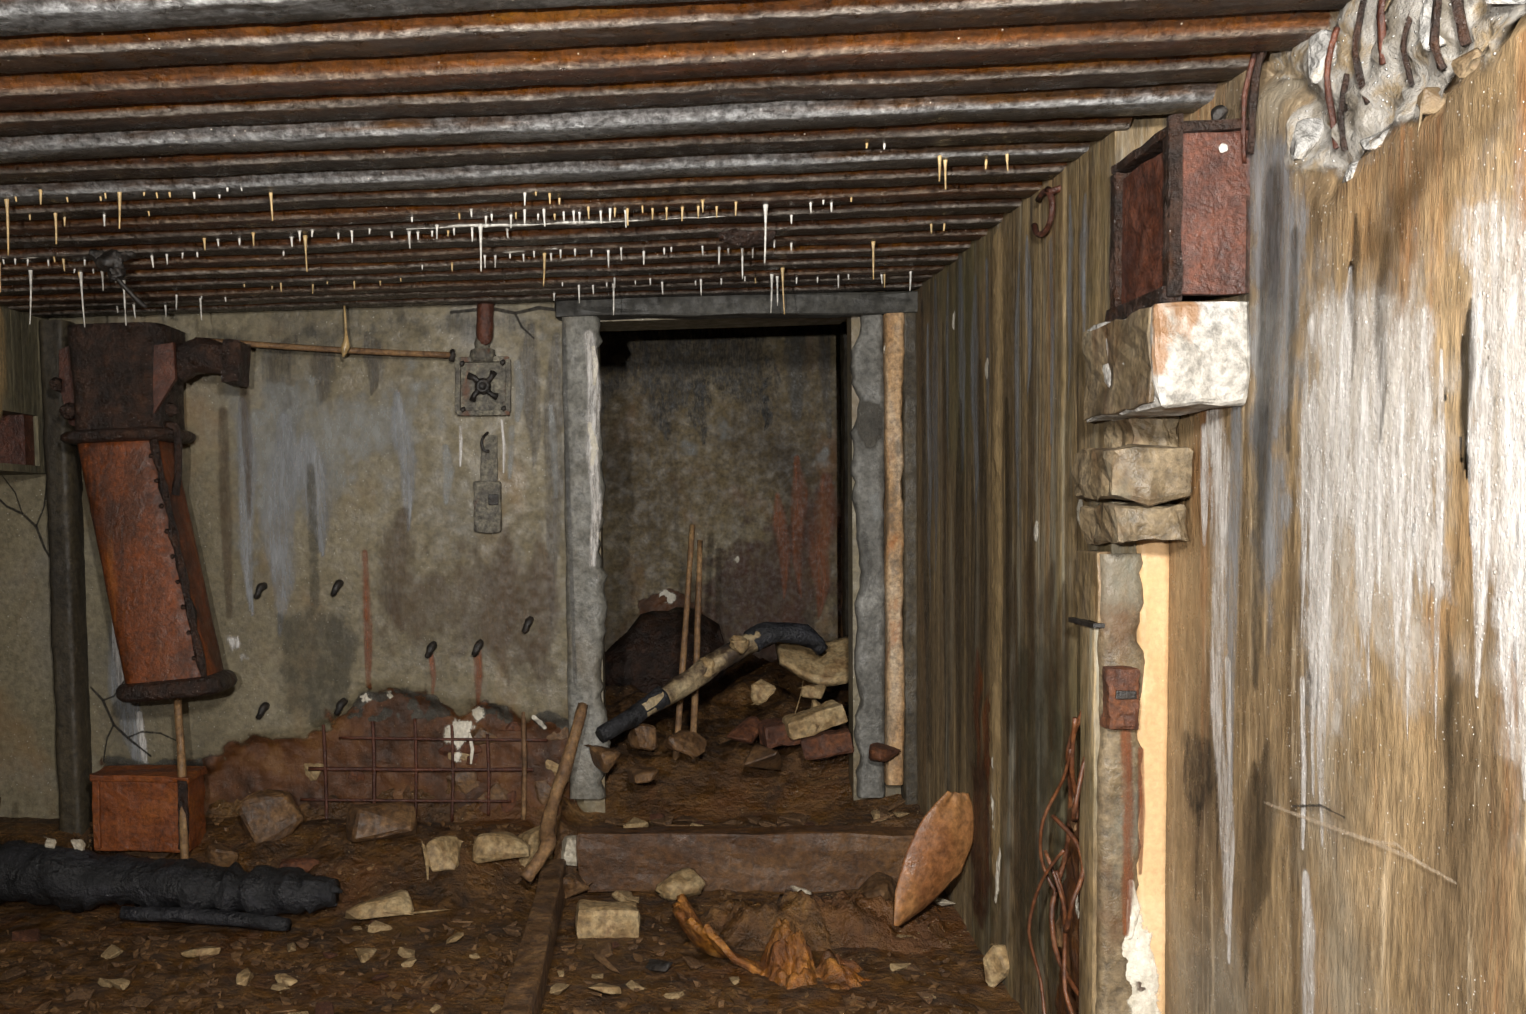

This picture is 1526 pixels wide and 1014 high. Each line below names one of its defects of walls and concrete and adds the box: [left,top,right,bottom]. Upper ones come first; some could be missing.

spalling [1241,0,1526,183]
crack [0,475,49,557]
rust [363,550,372,690]
leakage [238,320,563,723]
leakage [1183,142,1526,986]
leakage [1302,870,1315,1014]